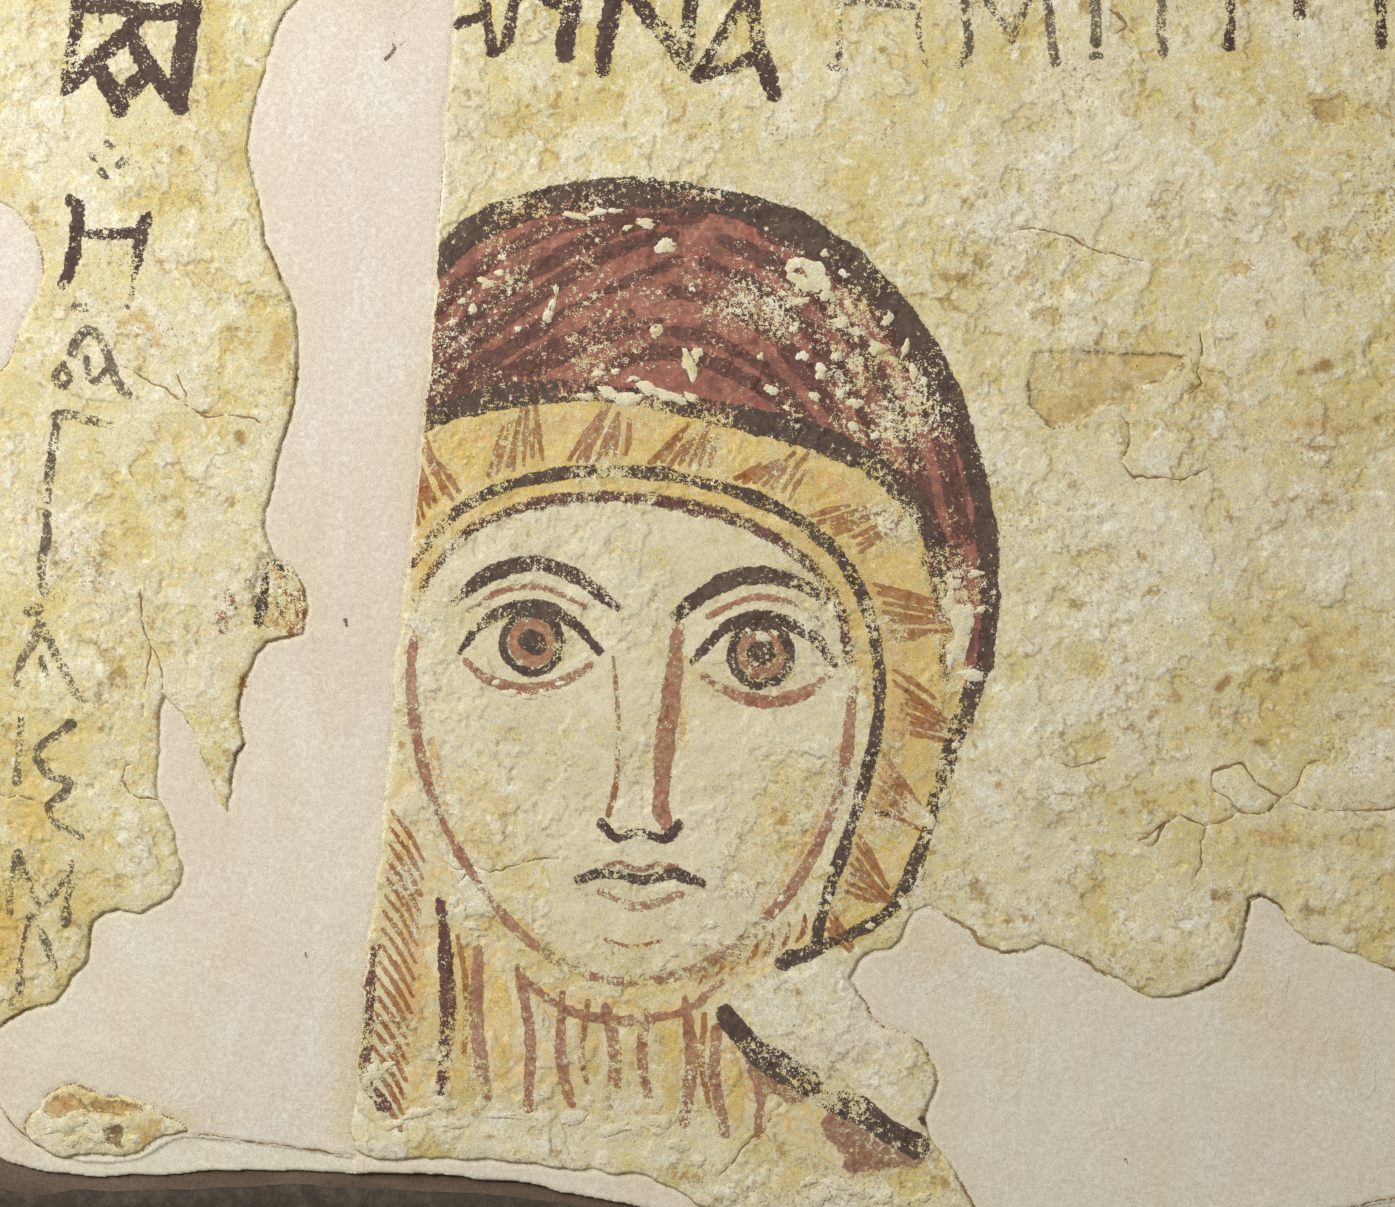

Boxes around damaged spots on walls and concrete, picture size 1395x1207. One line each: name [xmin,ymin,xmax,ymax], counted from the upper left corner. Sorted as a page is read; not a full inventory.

peeling [763,384,790,411]
peeling [795,350,907,440]
peeling [785,249,928,387]
crack [1190,333,1203,393]
crack [1121,415,1208,484]
spalling [0,0,705,1207]
peeling [743,628,780,642]
peeling [924,789,950,830]
crack [1138,759,1395,876]
spalling [850,894,1395,1207]